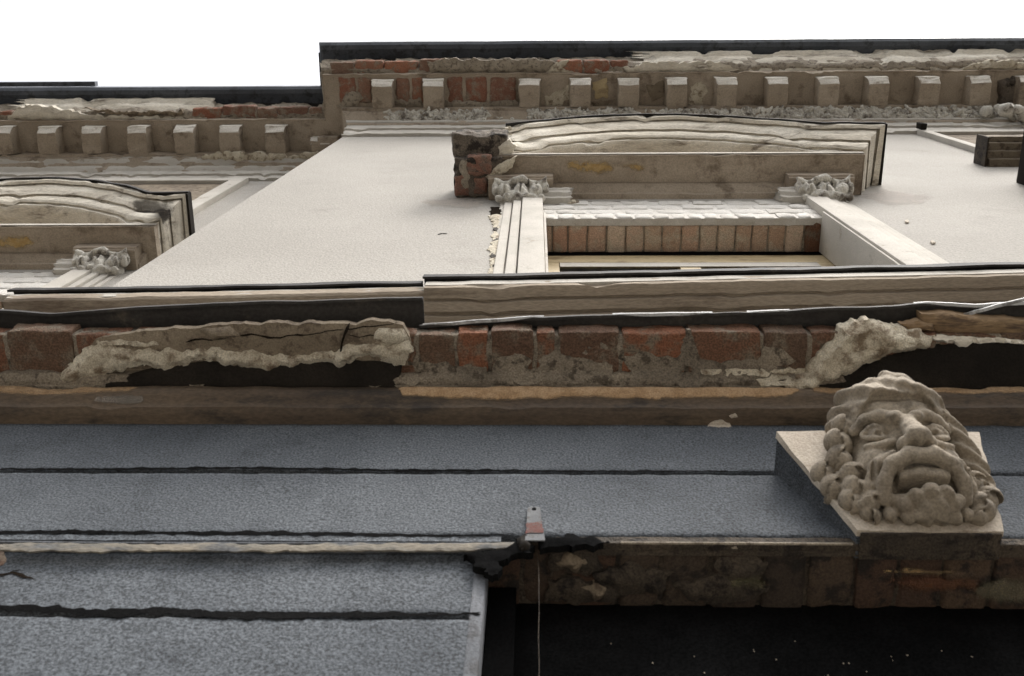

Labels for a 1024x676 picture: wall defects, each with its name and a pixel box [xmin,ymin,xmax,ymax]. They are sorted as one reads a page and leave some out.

flaking render [330,57,740,108]
flaking render [0,104,322,120]
peeling [486,139,517,179]
crack [187,322,397,352]
flaking render [0,315,935,400]